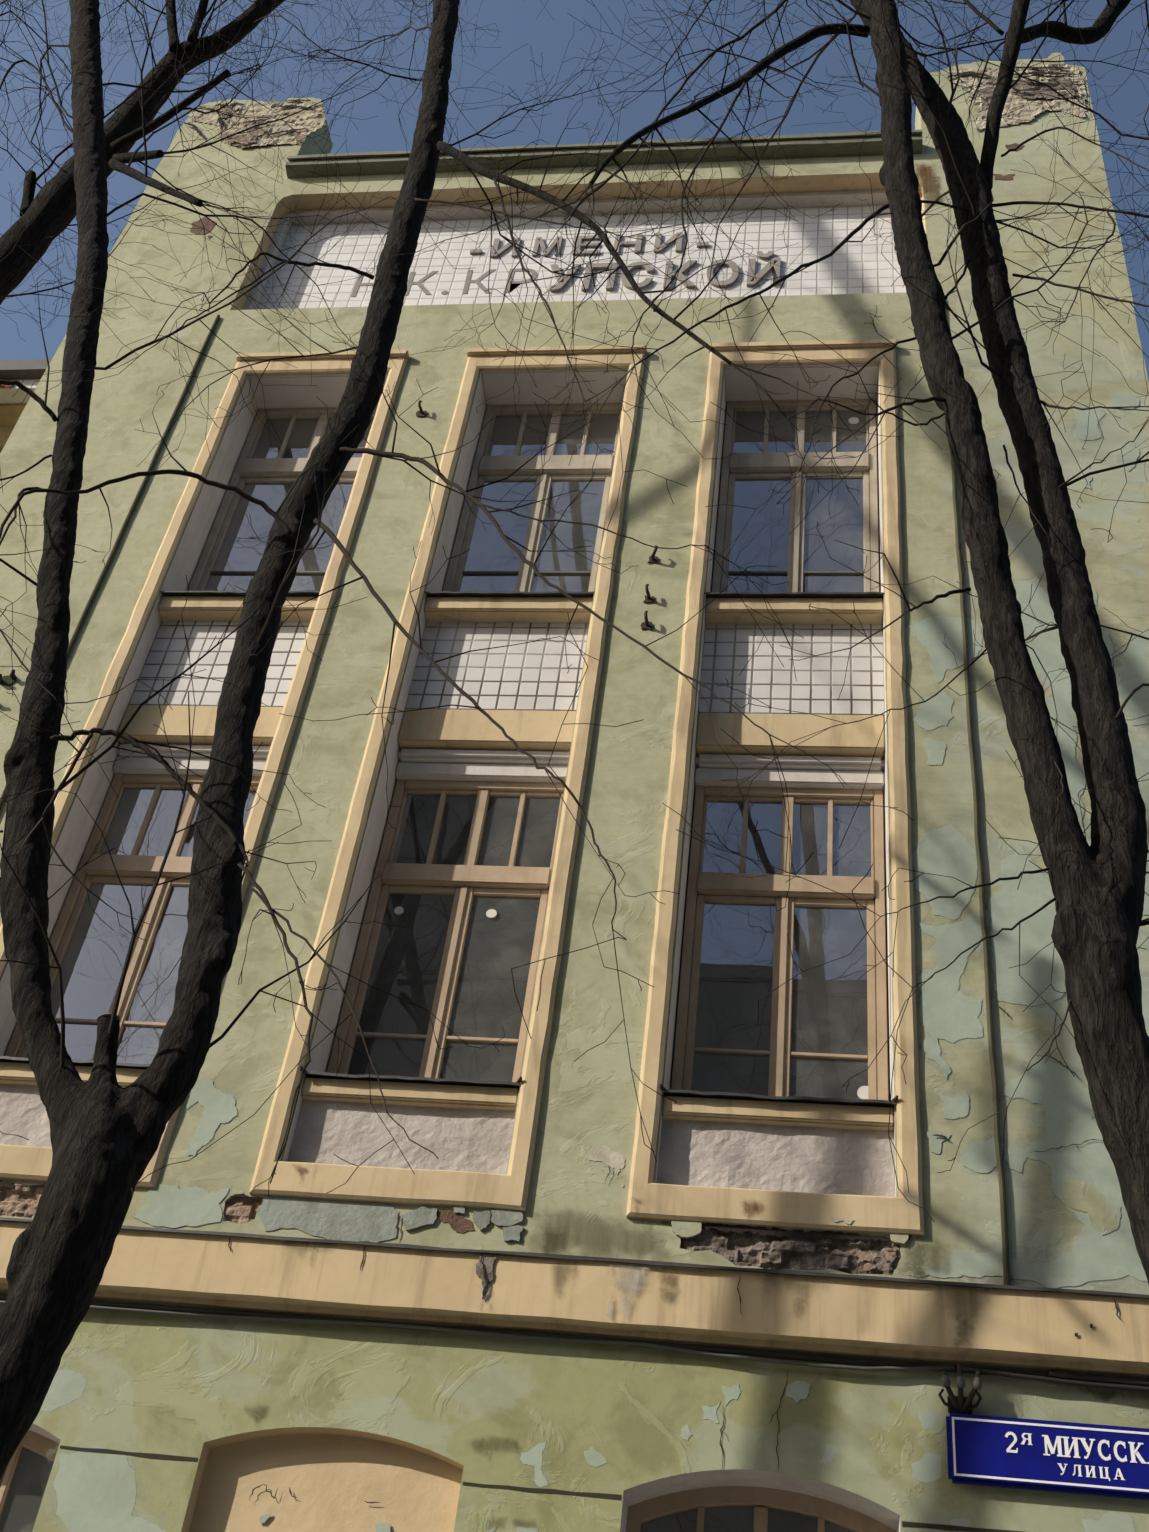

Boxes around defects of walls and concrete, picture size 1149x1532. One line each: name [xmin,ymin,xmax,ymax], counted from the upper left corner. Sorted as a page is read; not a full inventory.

spalling [184,99,327,148]
spalling [947,64,1087,130]
peeling [1116,443,1140,472]
peeling [906,615,983,766]
peeling [1013,577,1091,846]
peeling [1102,631,1149,811]
peeling [663,823,1149,1288]
spalling [0,1181,45,1218]
peeling [134,1183,524,1300]
peeling [40,1369,86,1412]
crack [720,1408,729,1470]
crack [769,1370,789,1471]